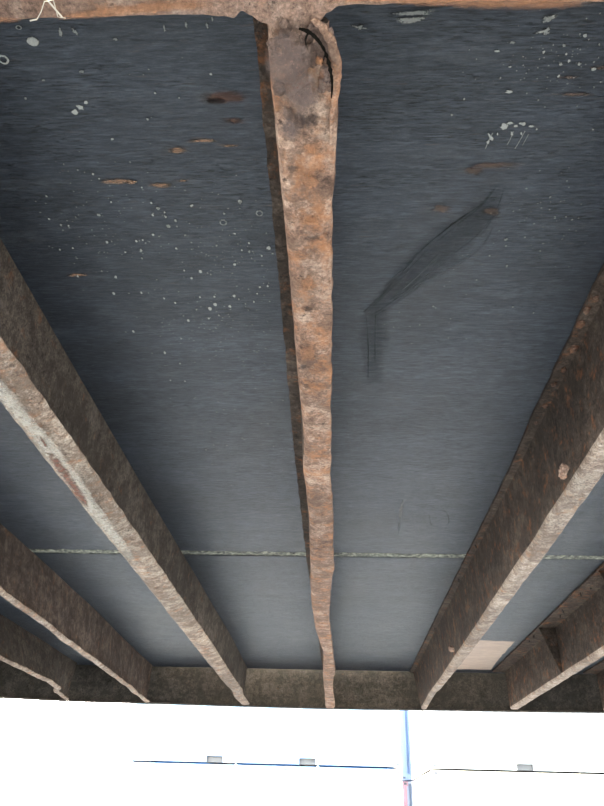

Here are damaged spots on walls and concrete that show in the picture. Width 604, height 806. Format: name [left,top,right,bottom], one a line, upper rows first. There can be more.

corrosion [69,1,199,18]
corrosion [343,0,572,8]
crack [298,27,334,99]
corrosion [302,115,317,127]
corrosion [558,463,569,480]